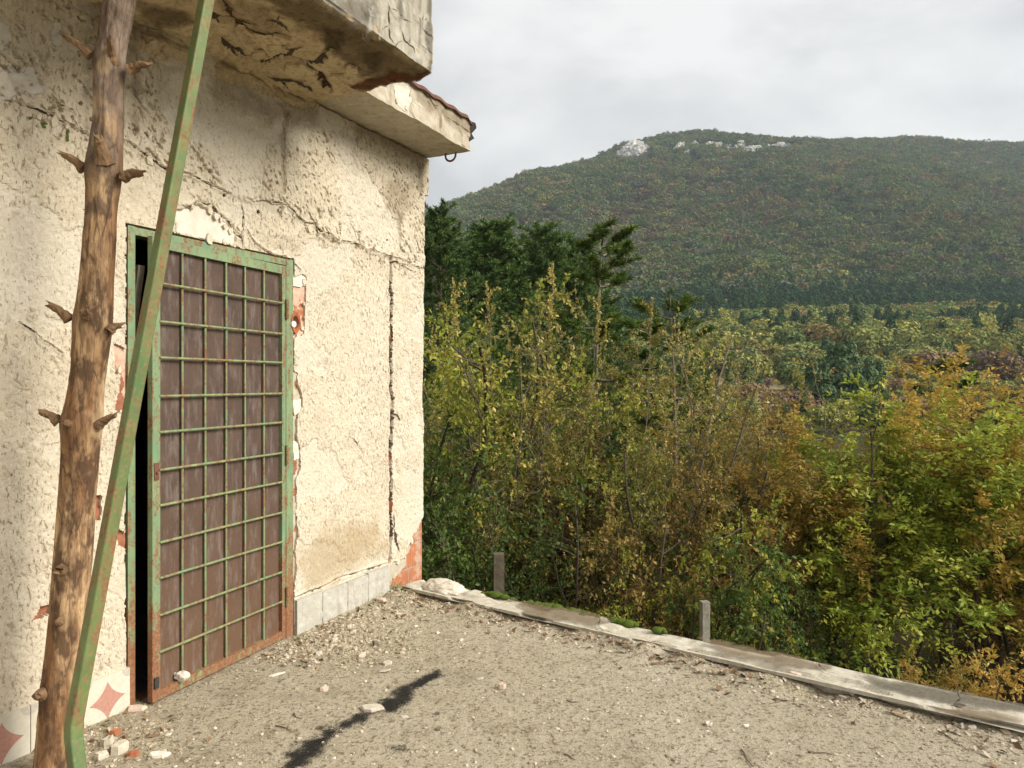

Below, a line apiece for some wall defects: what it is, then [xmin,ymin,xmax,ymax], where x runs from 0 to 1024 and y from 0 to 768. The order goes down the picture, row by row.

crack [212,0,364,94]
crack [361,6,434,54]
crack [4,100,86,131]
peeling [175,204,234,245]
crack [130,143,328,266]
spalling [291,274,307,338]
spalling [113,344,126,411]
crack [295,243,426,598]
spalling [388,519,422,586]